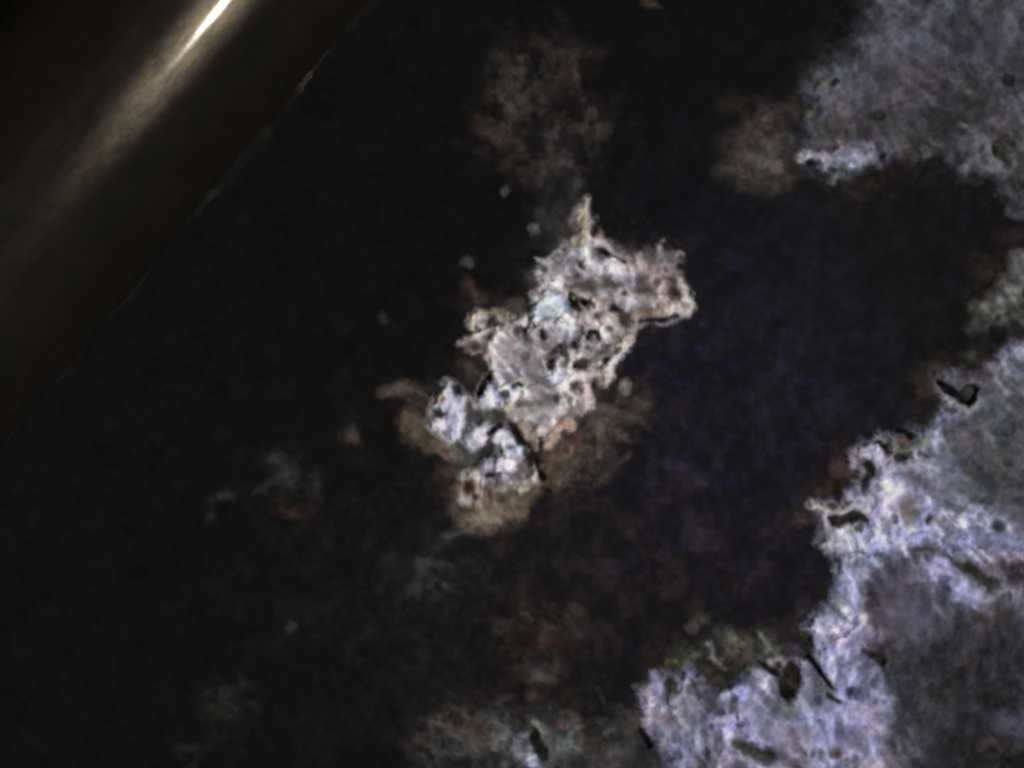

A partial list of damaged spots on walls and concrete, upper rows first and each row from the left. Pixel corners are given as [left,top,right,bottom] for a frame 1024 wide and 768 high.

leakage [460,256,474,269]